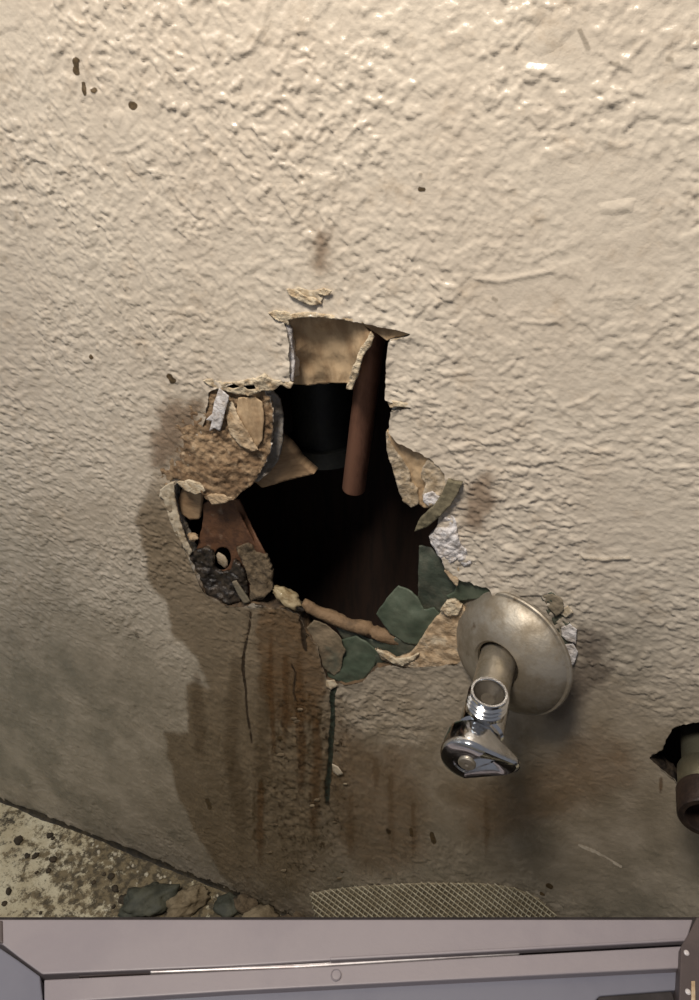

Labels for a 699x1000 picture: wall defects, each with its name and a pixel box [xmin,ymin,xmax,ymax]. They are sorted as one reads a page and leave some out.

spalling [159,287,490,686]
leakage [137,506,327,878]
crack [241,612,252,743]
crack [325,680,343,805]
peeling [541,592,578,665]
hole [650,726,681,784]